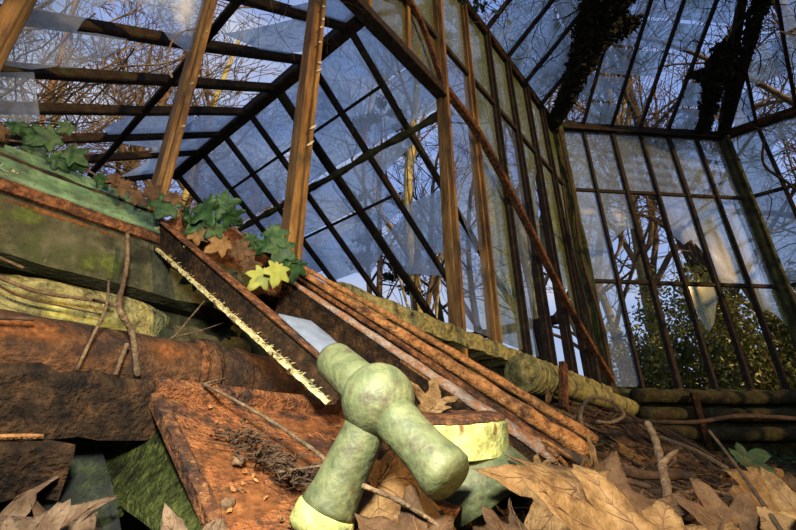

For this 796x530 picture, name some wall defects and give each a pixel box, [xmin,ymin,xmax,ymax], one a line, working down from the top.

rust [0,201,88,227]
rust [0,319,60,340]
rust [154,343,183,360]